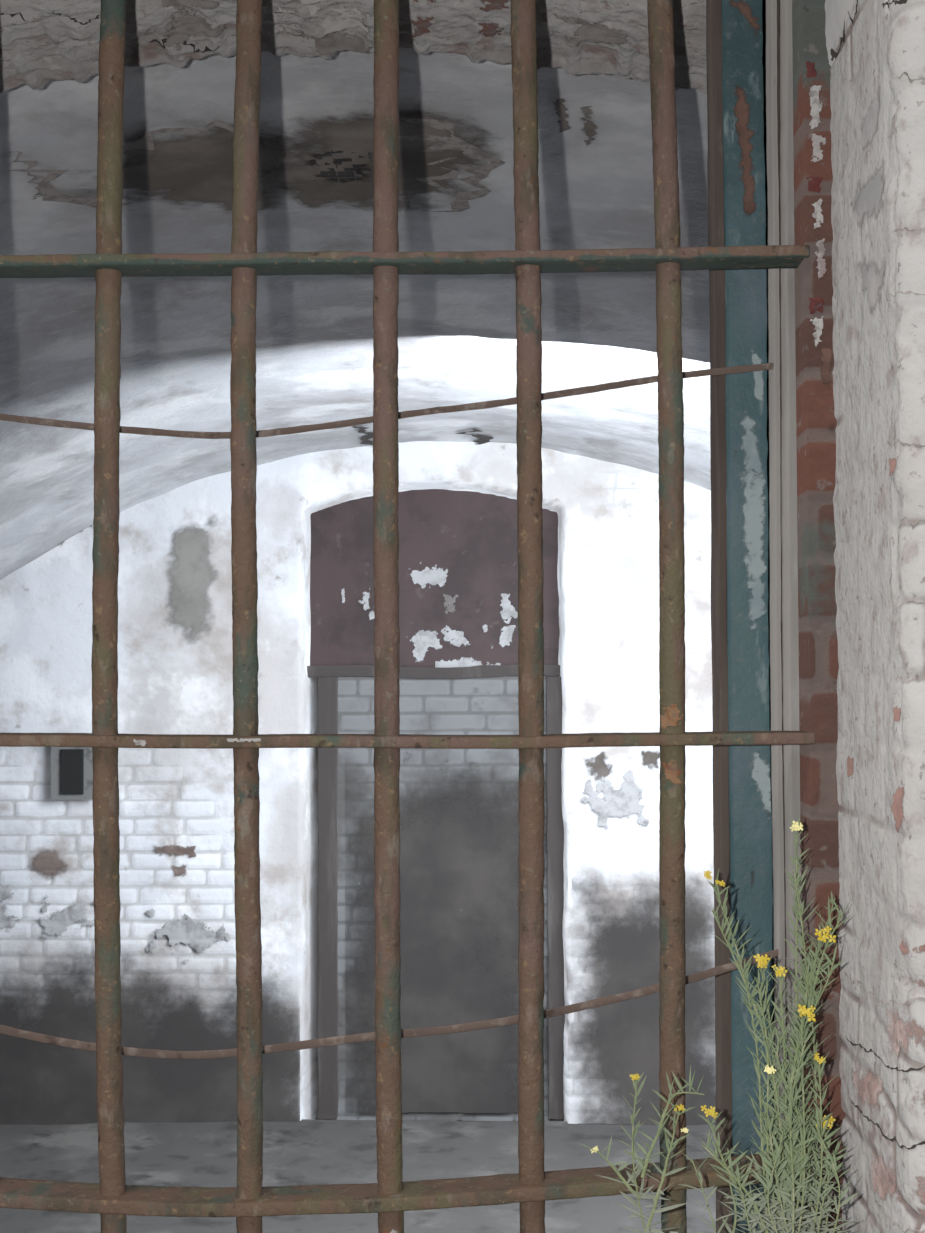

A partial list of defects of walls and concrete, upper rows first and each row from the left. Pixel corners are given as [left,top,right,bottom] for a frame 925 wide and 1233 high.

spalling [478,0,508,37]
crack [828,0,907,63]
corrosion [734,87,756,214]
peeling [809,85,826,162]
peeling [812,198,827,279]
peeling [810,316,824,347]
leakage [169,520,217,640]
peeling [341,588,375,620]
peeling [409,562,518,668]
corrosion [661,704,683,729]
corrosion [32,850,67,877]
corrosion [155,845,196,876]